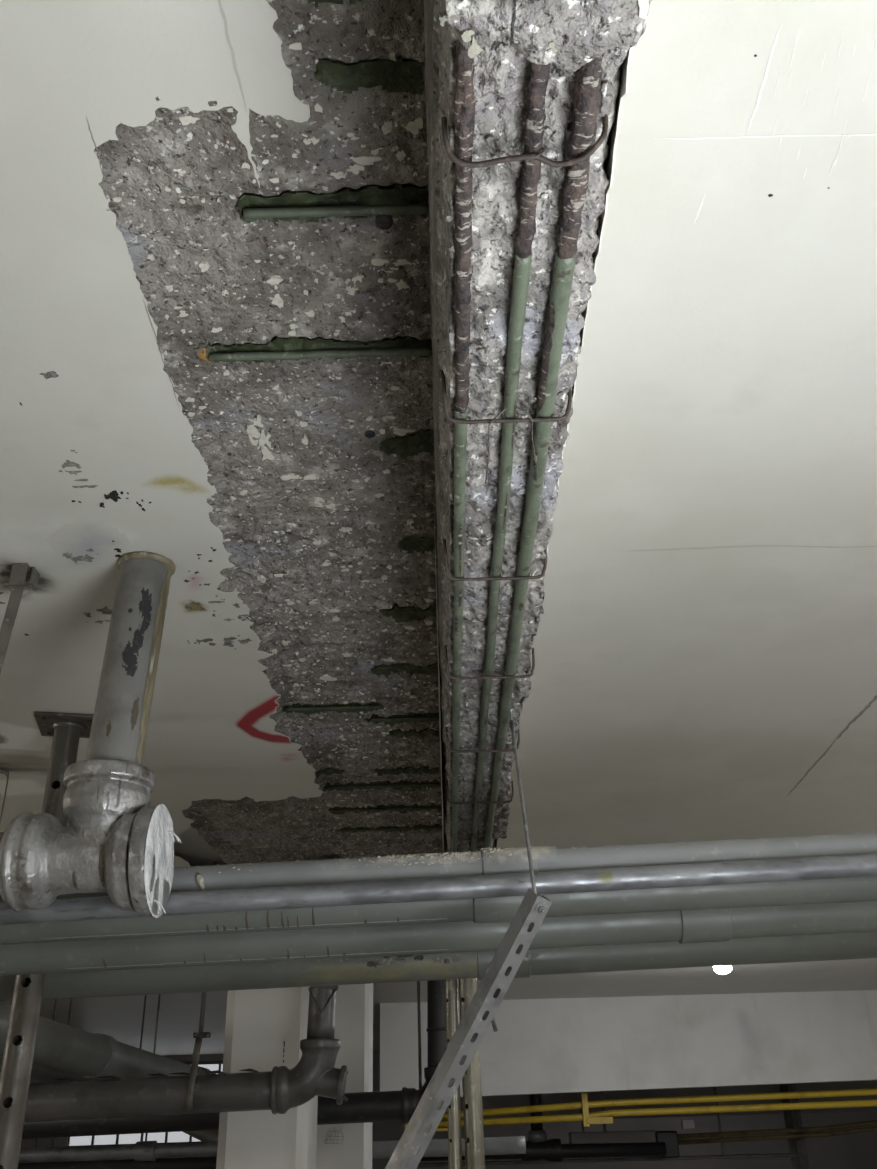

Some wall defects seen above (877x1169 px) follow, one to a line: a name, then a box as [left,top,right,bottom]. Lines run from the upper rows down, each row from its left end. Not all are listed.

peeling [59,450,152,511]
spalling [94,0,652,865]
peeling [62,548,99,564]
crack [787,695,877,796]